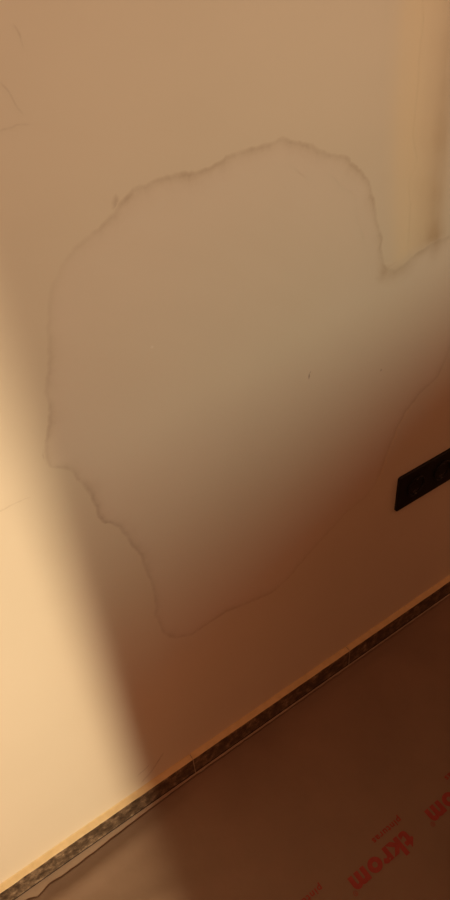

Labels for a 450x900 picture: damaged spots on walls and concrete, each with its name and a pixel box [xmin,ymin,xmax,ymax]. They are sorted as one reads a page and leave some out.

damp [37,0,450,642]